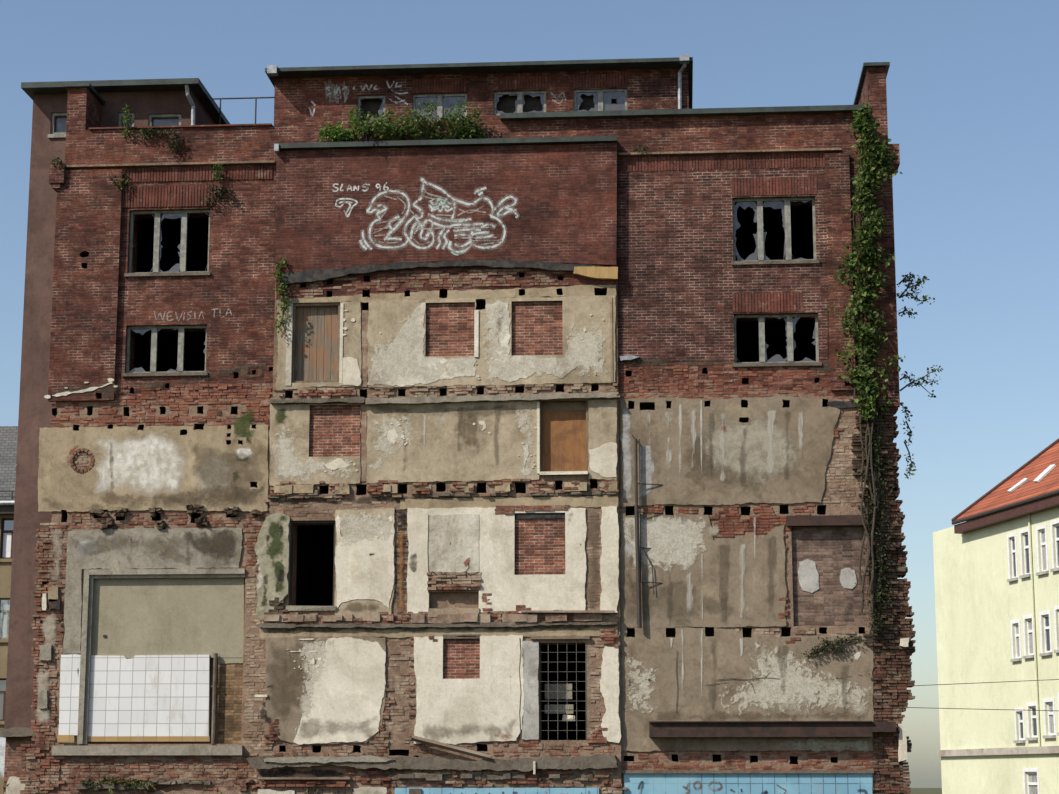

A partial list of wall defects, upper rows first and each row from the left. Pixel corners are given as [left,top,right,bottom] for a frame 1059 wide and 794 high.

flaking render [281,269,574,298]
leakage [97,435,247,504]
leakage [236,448,252,458]
leakage [666,401,803,481]
flaking render [4,300,874,794]